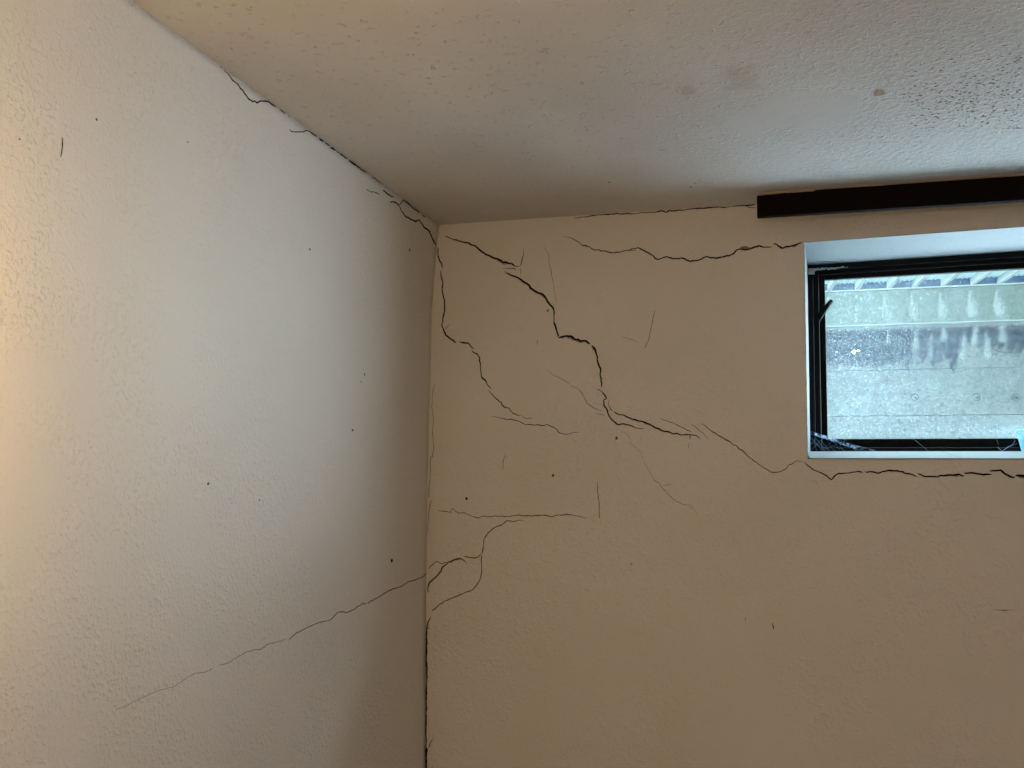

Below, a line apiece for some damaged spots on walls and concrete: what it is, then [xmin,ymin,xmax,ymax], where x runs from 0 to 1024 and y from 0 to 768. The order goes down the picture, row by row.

crack [220,66,1024,513]
crack [118,385,600,768]